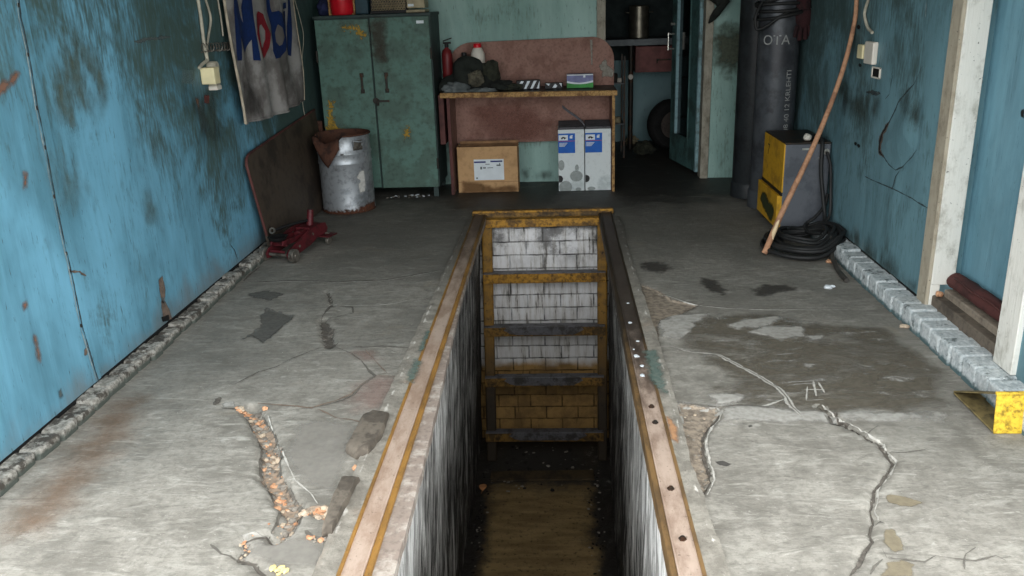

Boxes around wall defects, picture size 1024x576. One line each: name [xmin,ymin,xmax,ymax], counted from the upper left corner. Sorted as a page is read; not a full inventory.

rust [0,72,19,94]
water stain [57,46,104,126]
crack [865,67,927,208]
spalling [242,291,293,343]
spalling [642,286,707,343]
crack [210,246,438,576]
spalling [677,393,946,492]
crack [672,346,1005,576]